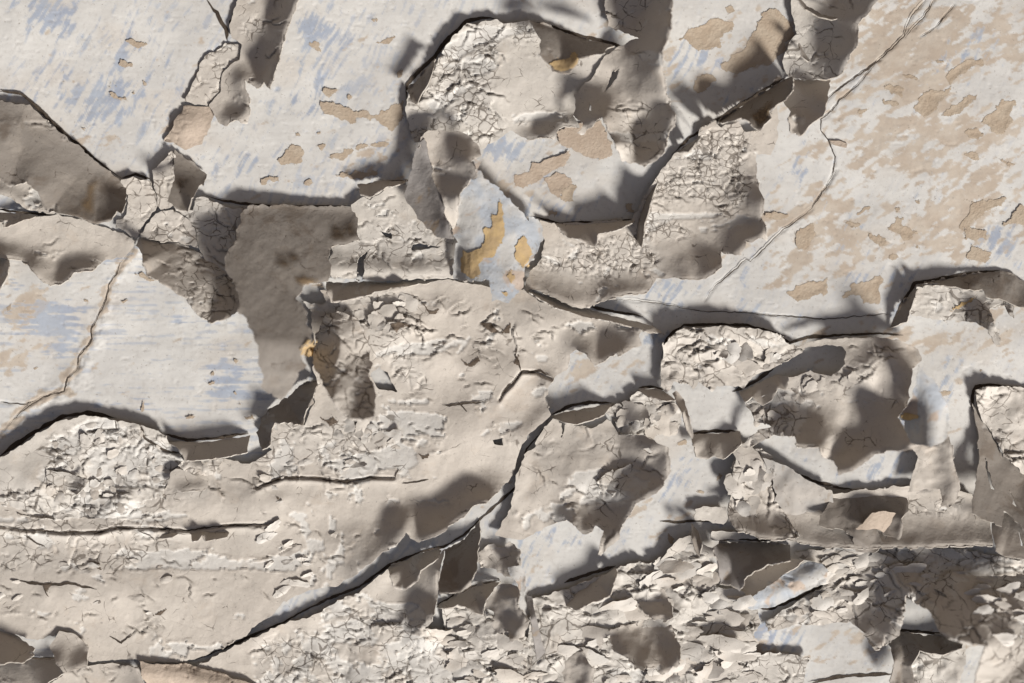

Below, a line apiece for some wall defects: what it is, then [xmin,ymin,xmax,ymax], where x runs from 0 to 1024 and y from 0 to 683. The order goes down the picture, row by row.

spalling [317,87,404,180]
peeling [514,0,735,202]
crack [591,1,999,358]
crack [0,258,249,456]
peeling [0,107,789,683]
peeling [910,282,1014,345]
peeling [975,386,1024,475]
crack [14,580,97,597]
crack [1,523,264,547]
crack [255,469,429,489]
crack [188,487,515,663]
peeling [855,511,896,532]